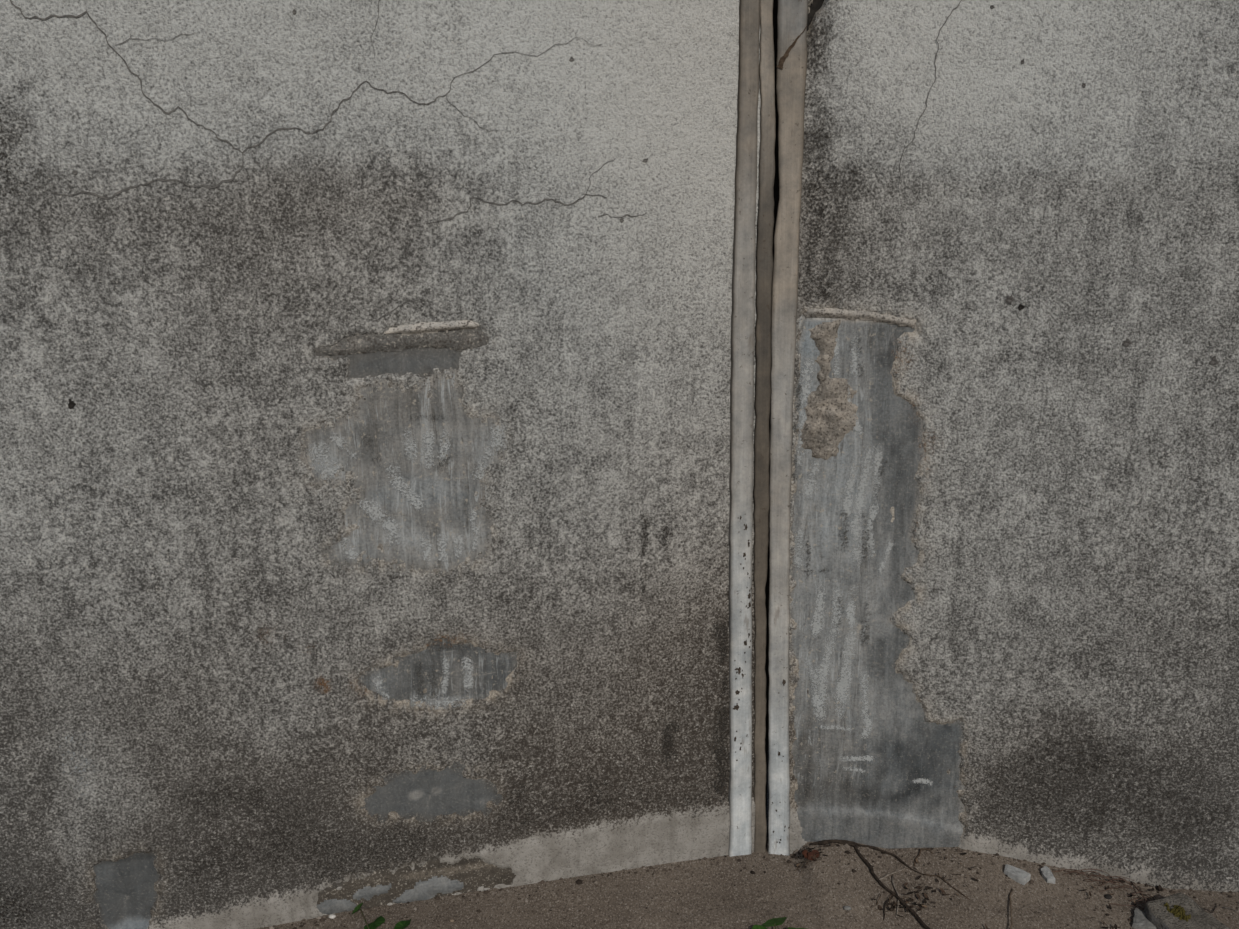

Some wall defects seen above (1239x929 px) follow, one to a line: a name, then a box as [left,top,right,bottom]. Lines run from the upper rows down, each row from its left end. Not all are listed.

crack [776,0,824,70]
crack [10,0,601,199]
crack [897,0,962,193]
crack [430,156,646,223]
spalling [315,320,489,379]
spalling [795,319,858,460]
spalling [358,639,519,709]
leakage [172,780,426,892]
leakage [990,733,1233,842]